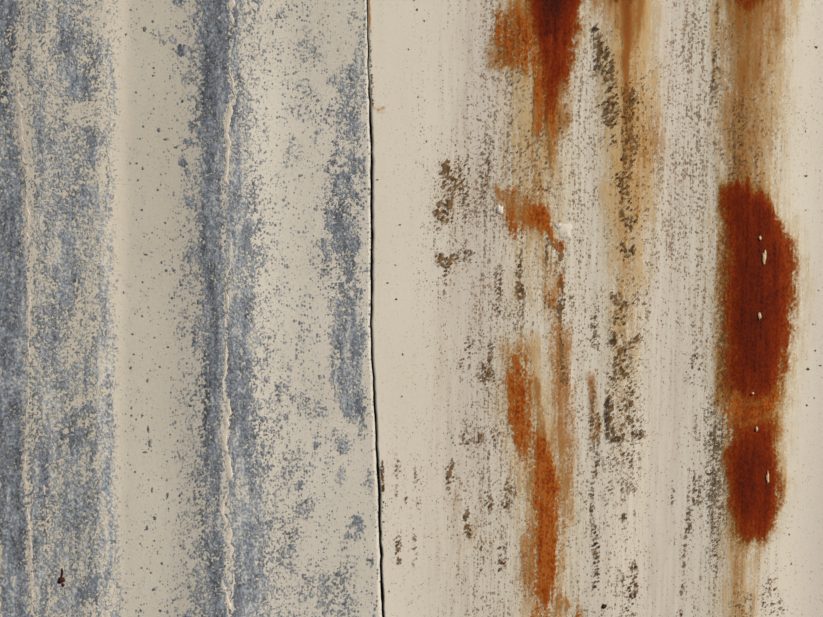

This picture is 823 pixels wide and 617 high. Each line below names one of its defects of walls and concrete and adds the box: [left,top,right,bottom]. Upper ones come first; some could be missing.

rust [432,0,662,617]
rust [710,0,800,548]